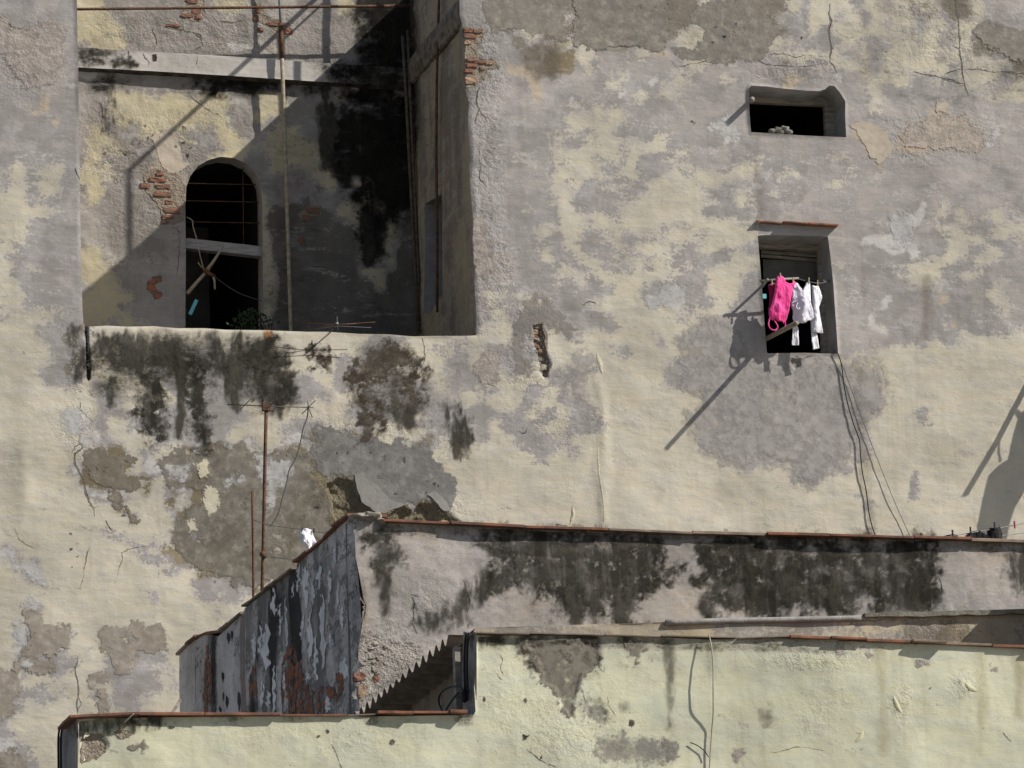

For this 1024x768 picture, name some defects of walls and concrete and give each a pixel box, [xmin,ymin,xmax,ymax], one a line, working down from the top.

peeling [462,0,780,88]
crack [734,4,852,73]
crack [915,0,1024,96]
flaking render [116,124,190,225]
damp [304,4,412,267]
damp [69,322,332,457]
damp [344,338,434,442]
crack [73,330,143,571]
peeling [156,424,458,714]
damp [359,528,407,615]
damp [413,521,944,671]
peeling [86,619,169,713]